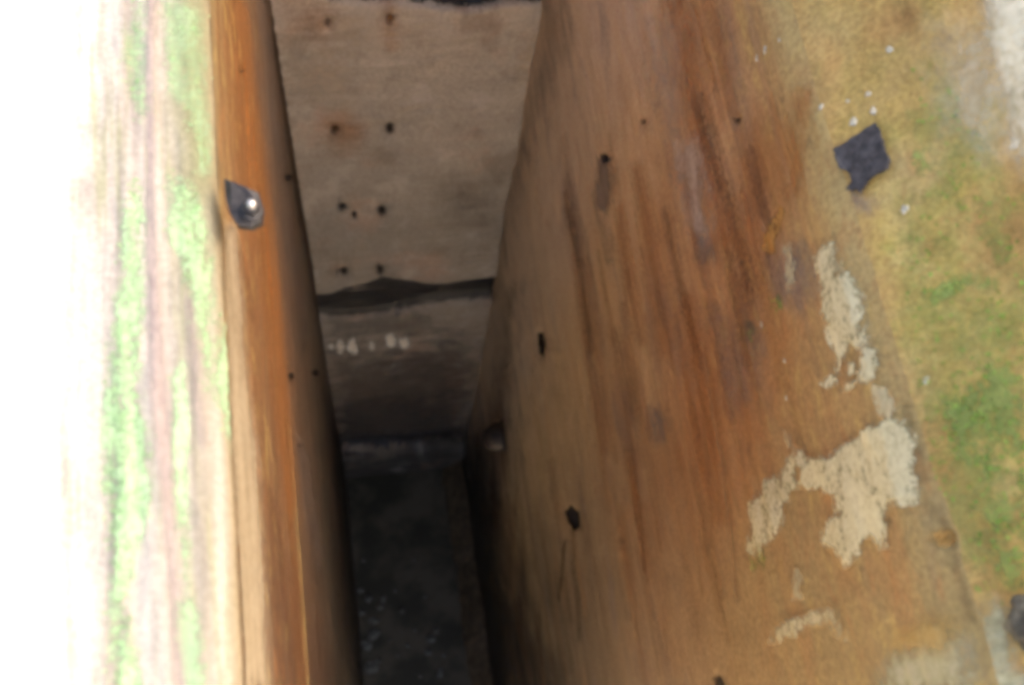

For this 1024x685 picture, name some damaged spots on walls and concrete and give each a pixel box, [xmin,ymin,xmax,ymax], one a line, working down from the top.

peeling [746,242,919,569]